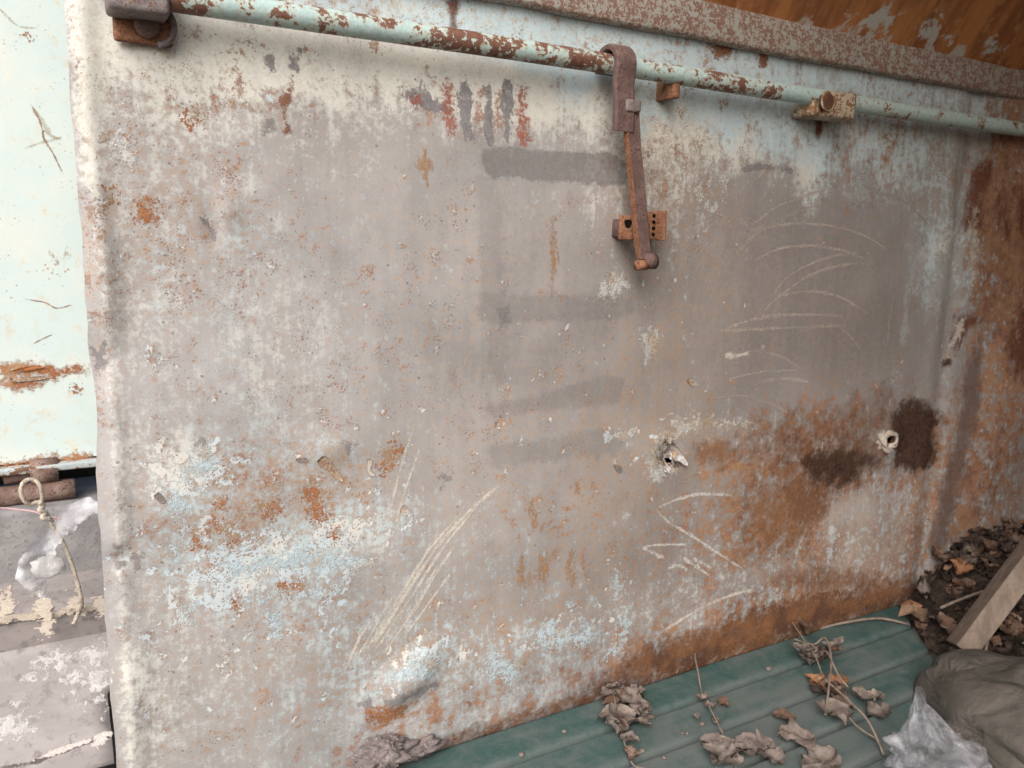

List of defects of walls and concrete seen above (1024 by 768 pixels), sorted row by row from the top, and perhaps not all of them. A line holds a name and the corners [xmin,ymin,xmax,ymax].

rust [447,0,458,28]
rust [964,162,991,296]
rust [936,315,977,366]
rust [0,360,83,396]
rust [374,439,404,477]
leakage [802,450,877,489]
leakage [891,400,938,470]
rust [189,495,242,553]
rust [256,496,287,523]
rust [301,480,344,541]
rust [275,579,309,599]
rust [510,573,916,719]